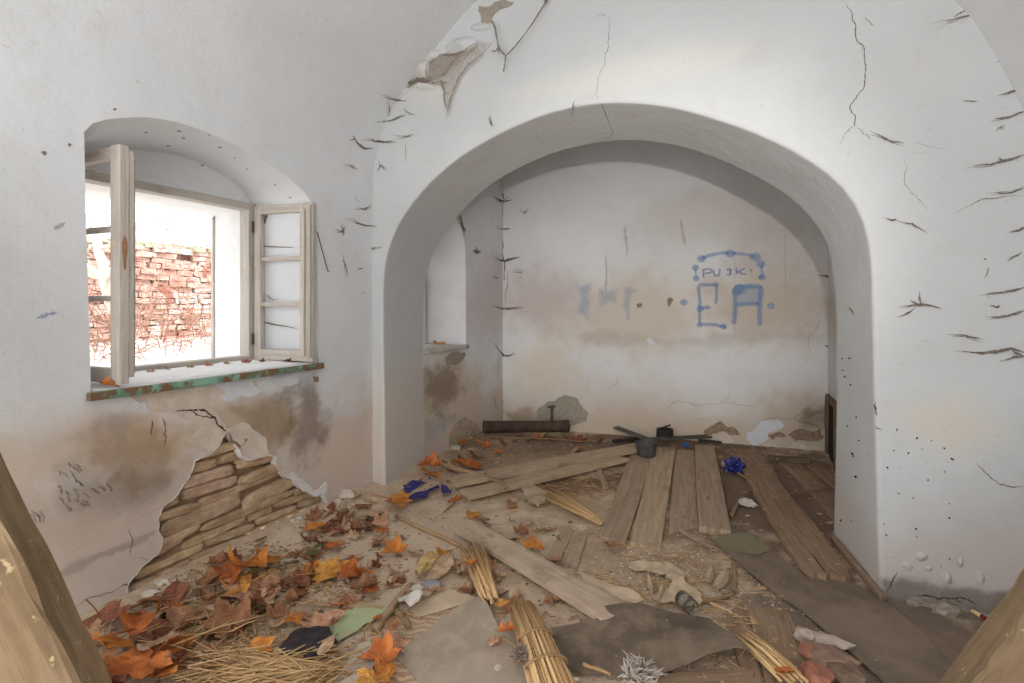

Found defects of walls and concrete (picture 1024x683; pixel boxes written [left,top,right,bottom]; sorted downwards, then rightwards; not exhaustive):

spalling [478,0,514,23]
spalling [429,44,477,78]
crack [840,2,874,144]
crack [173,409,226,431]
spalling [537,395,589,426]
flaking render [703,414,825,451]
spalling [126,379,329,594]